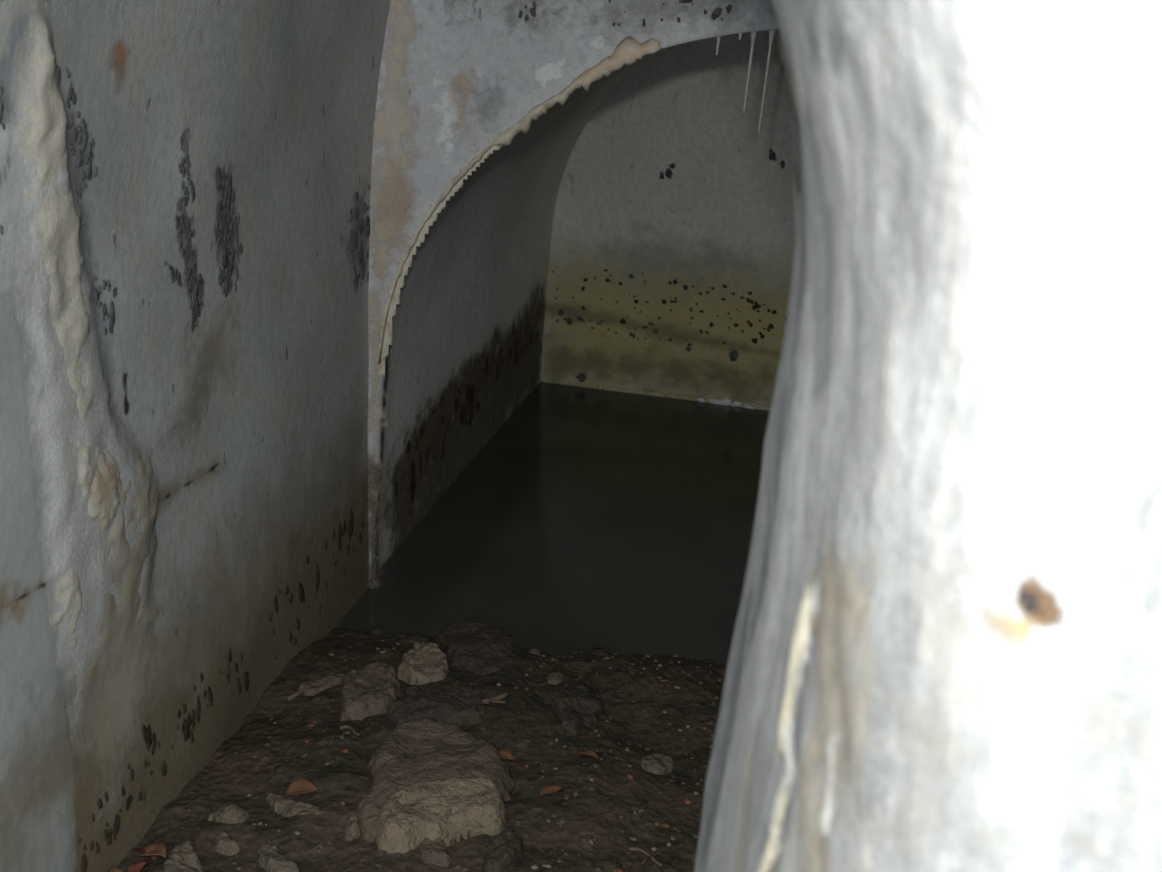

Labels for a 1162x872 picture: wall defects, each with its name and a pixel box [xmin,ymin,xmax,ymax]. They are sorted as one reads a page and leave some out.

water stain [55,65,98,199]
spalling [378,36,662,364]
water stain [75,0,830,872]